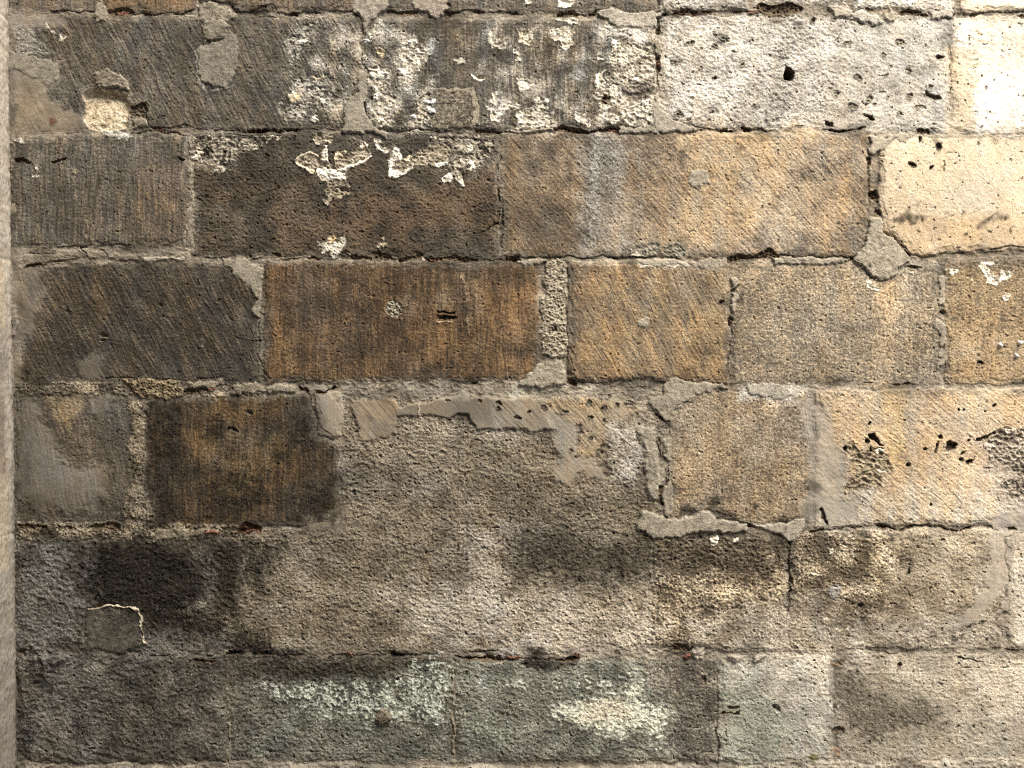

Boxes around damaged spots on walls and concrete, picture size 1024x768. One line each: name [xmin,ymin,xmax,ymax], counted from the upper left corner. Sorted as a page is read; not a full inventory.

spalling [488,28,534,61]
spalling [549,0,578,50]
spalling [593,22,656,127]
spalling [279,20,494,205]
spalling [485,76,557,130]
spalling [570,108,591,127]
spalling [178,134,282,173]
spalling [984,427,1024,501]
crack [787,523,1017,612]
damp [498,675,612,690]